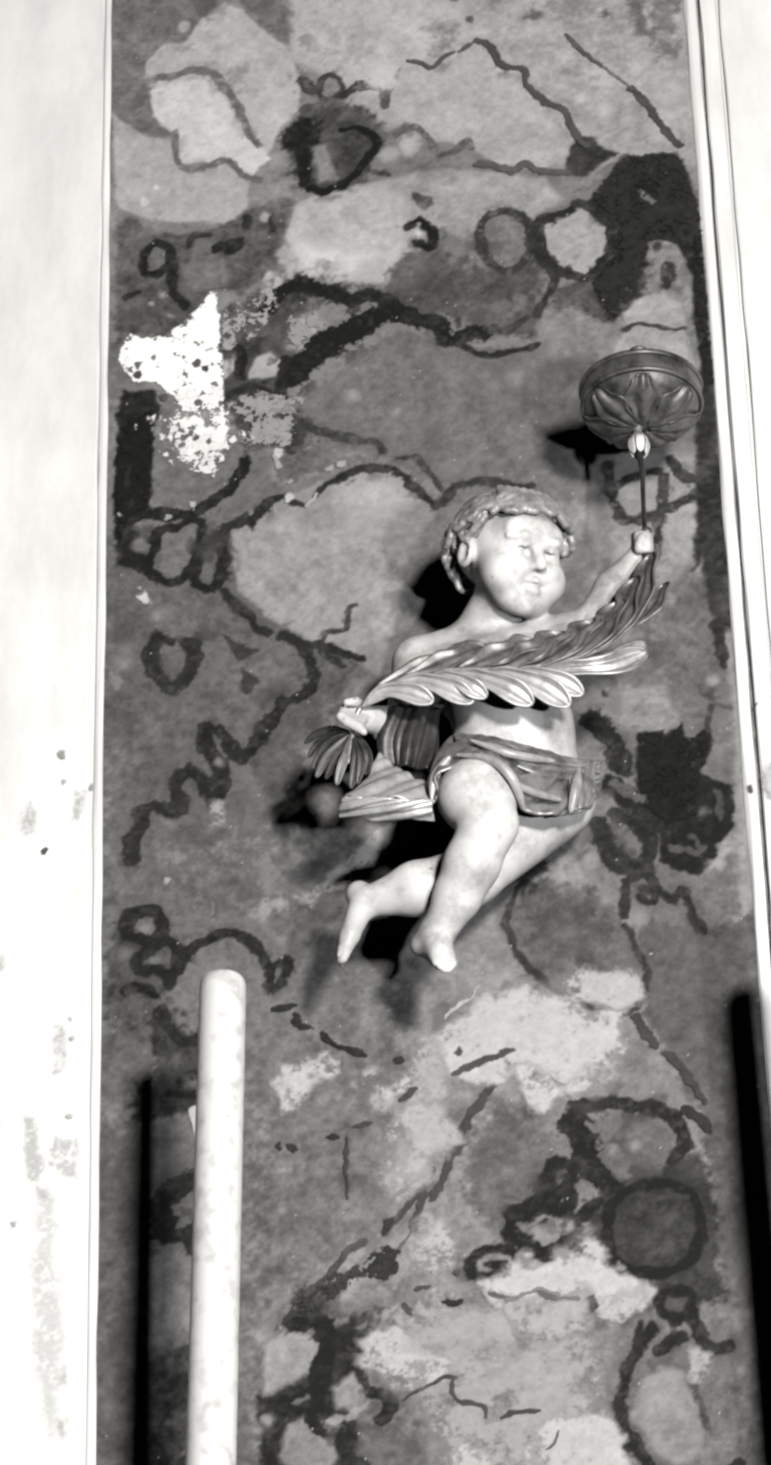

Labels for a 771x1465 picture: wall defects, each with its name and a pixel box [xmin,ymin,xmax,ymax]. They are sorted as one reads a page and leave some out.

flaking render [118,288,322,507]